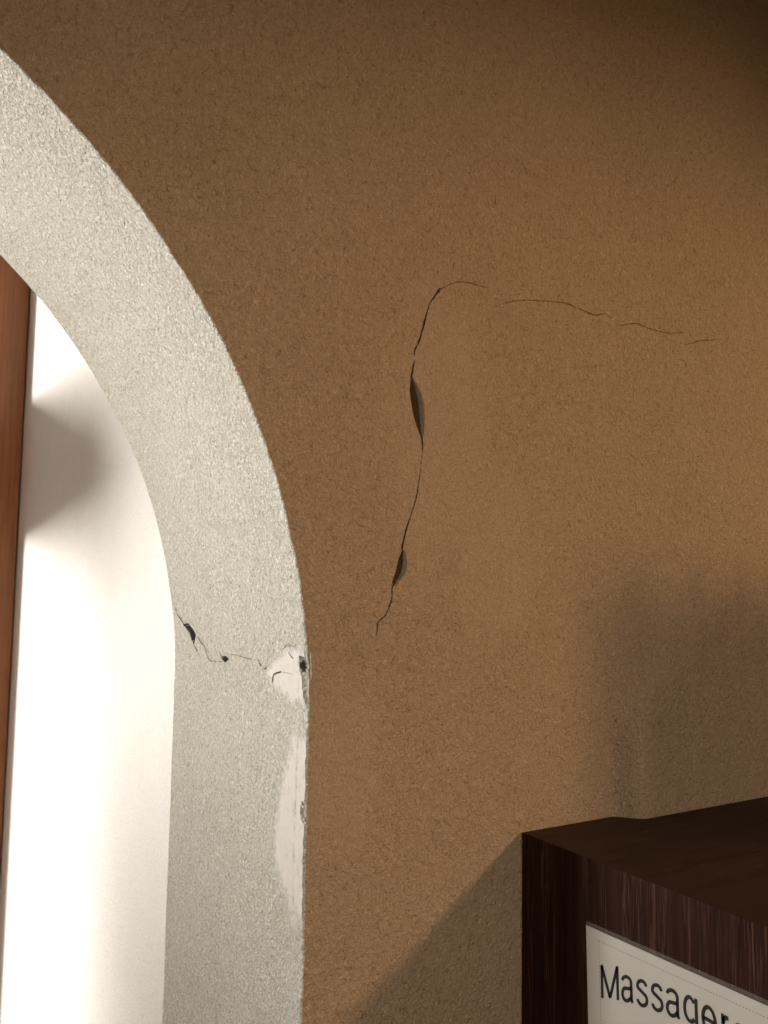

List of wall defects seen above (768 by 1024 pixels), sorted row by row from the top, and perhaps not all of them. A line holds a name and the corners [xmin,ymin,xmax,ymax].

crack [377,281,713,632]
crack [174,607,301,682]
flaking render [300,652,312,705]